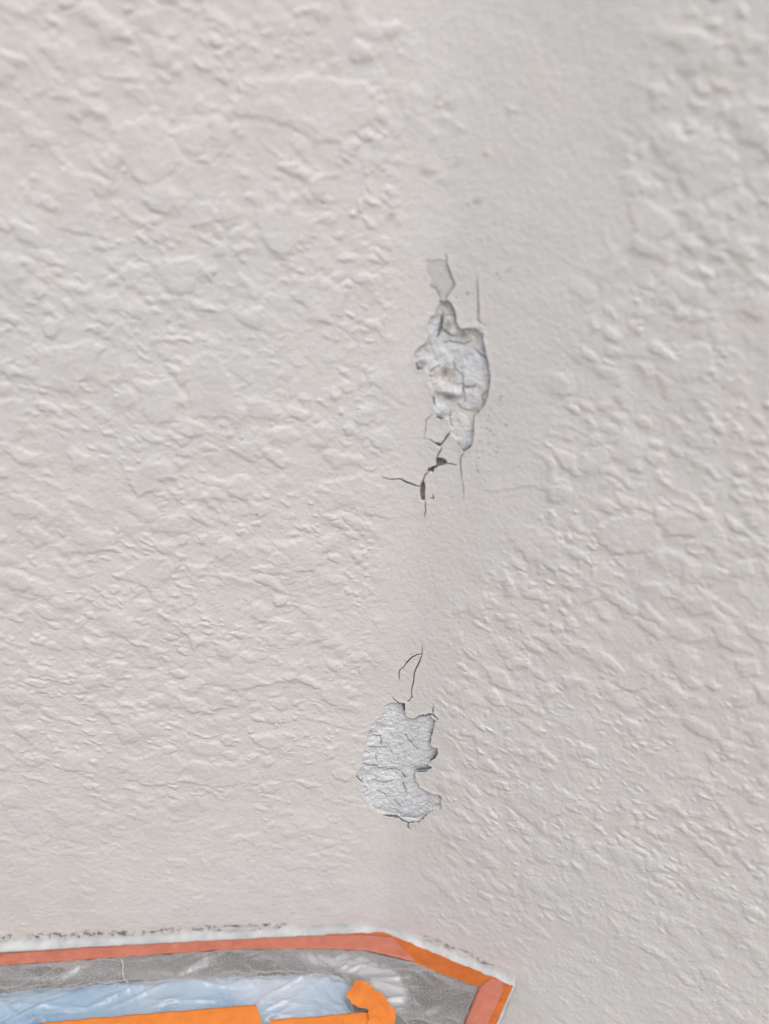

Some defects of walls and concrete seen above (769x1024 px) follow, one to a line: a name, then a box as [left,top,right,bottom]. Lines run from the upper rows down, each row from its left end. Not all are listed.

spalling [415,258,490,453]
crack [386,420,464,517]
crack [392,654,437,718]
spalling [357,703,441,824]